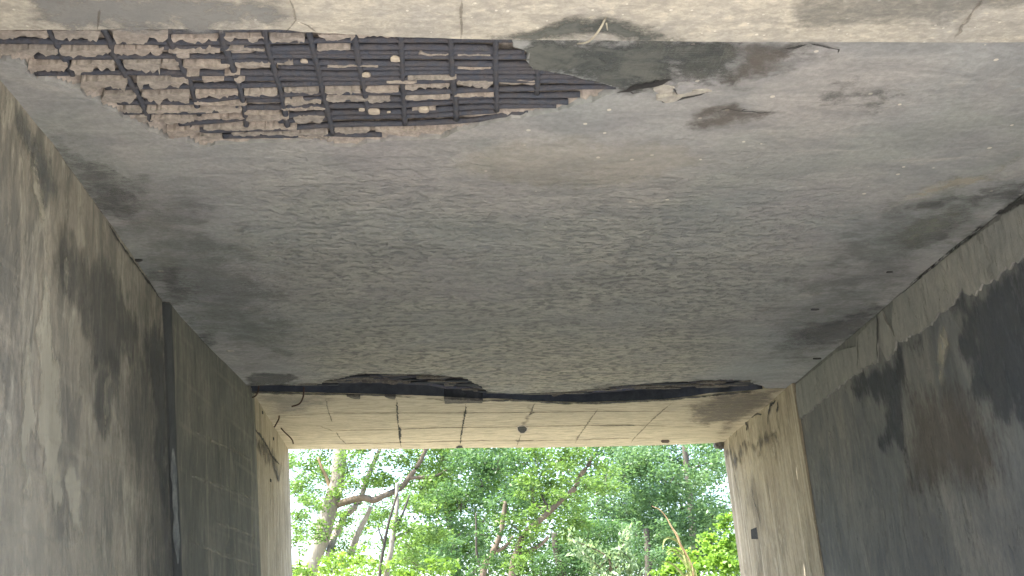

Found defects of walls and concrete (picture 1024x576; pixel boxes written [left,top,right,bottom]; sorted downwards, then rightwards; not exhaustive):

crack [957,3,980,35]
spalling [0,29,616,145]
peeling [653,81,712,103]
damp [17,114,55,220]
damp [21,280,81,529]
crack [396,403,418,443]
spalling [248,373,763,407]
damp [691,390,778,434]
damp [853,261,1024,489]